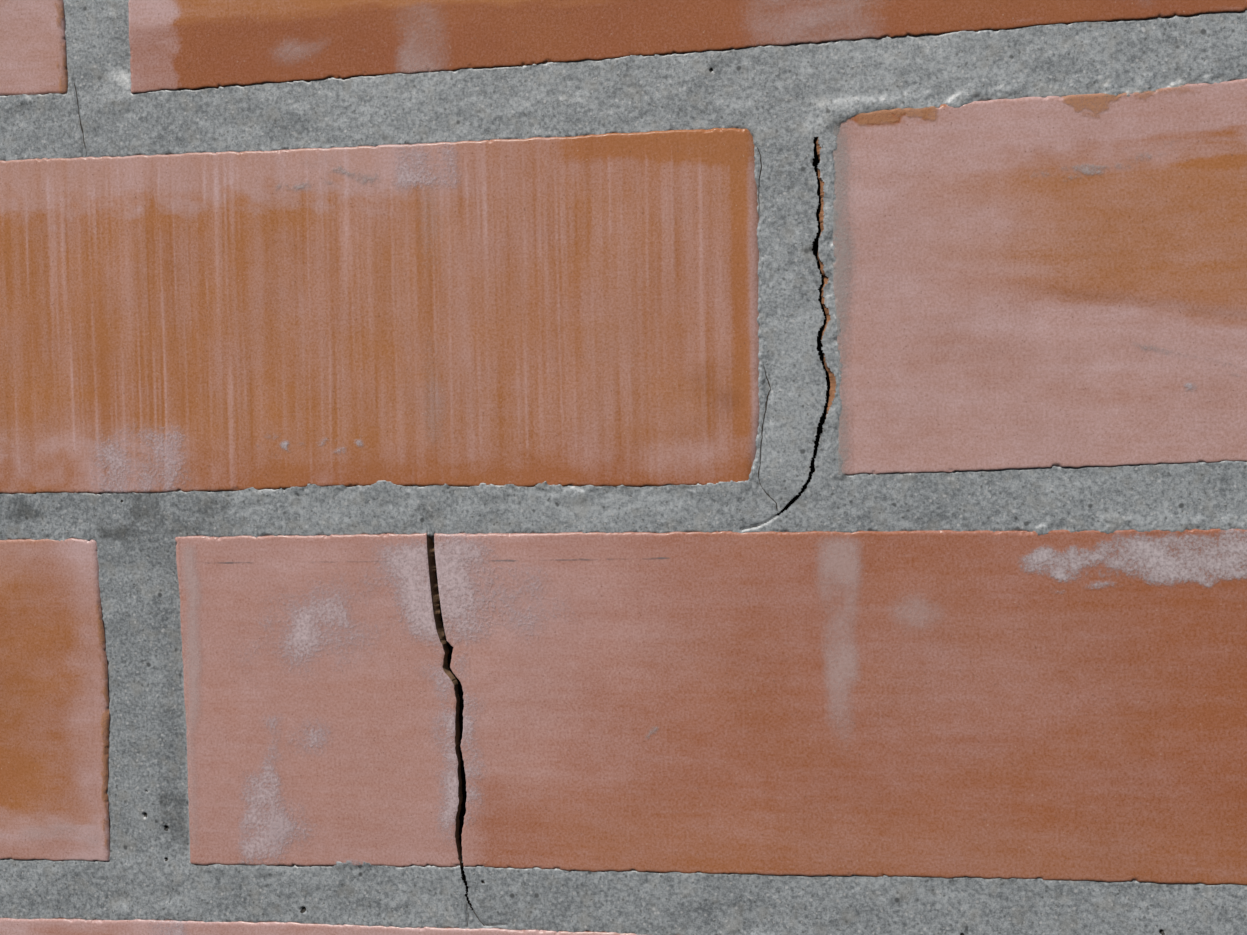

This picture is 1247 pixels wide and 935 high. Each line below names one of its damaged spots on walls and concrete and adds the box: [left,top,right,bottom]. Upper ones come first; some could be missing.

crack [742,137,837,530]
crack [427,535,493,927]
efflorescence [1021,529,1247,586]